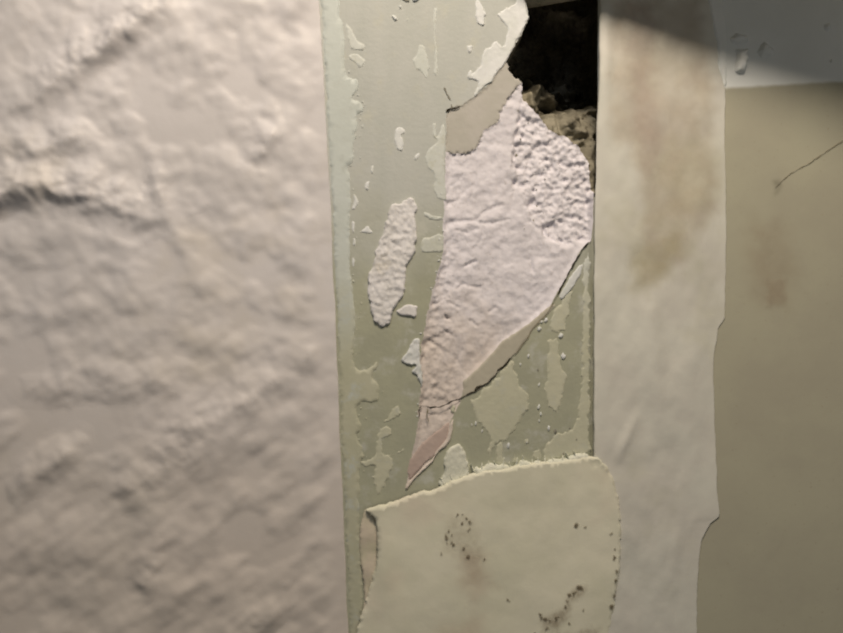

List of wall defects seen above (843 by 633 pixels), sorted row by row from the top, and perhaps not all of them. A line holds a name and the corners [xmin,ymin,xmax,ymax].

flaking render [320,0,598,633]